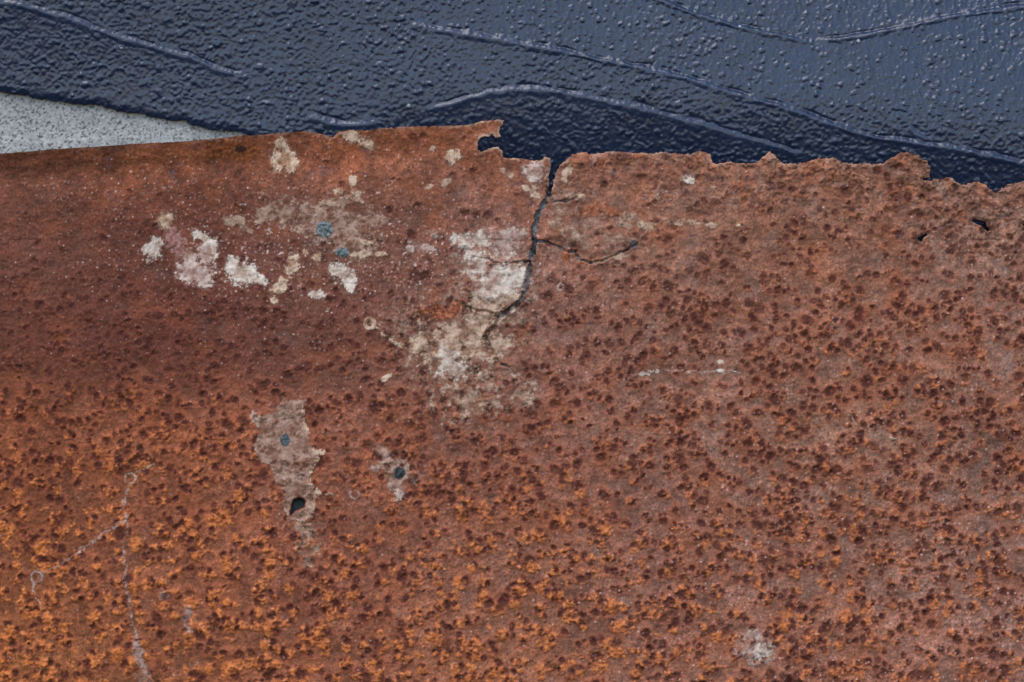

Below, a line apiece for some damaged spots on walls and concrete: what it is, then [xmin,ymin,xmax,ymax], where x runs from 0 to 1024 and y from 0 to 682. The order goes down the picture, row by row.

corrosion [205,144,257,161]
peeling [270,137,300,174]
peeling [235,195,387,259]
corrosion [421,301,463,321]
crack [468,196,635,367]
peeling [250,397,335,554]
peeling [371,442,414,501]
corrosion [290,497,305,515]